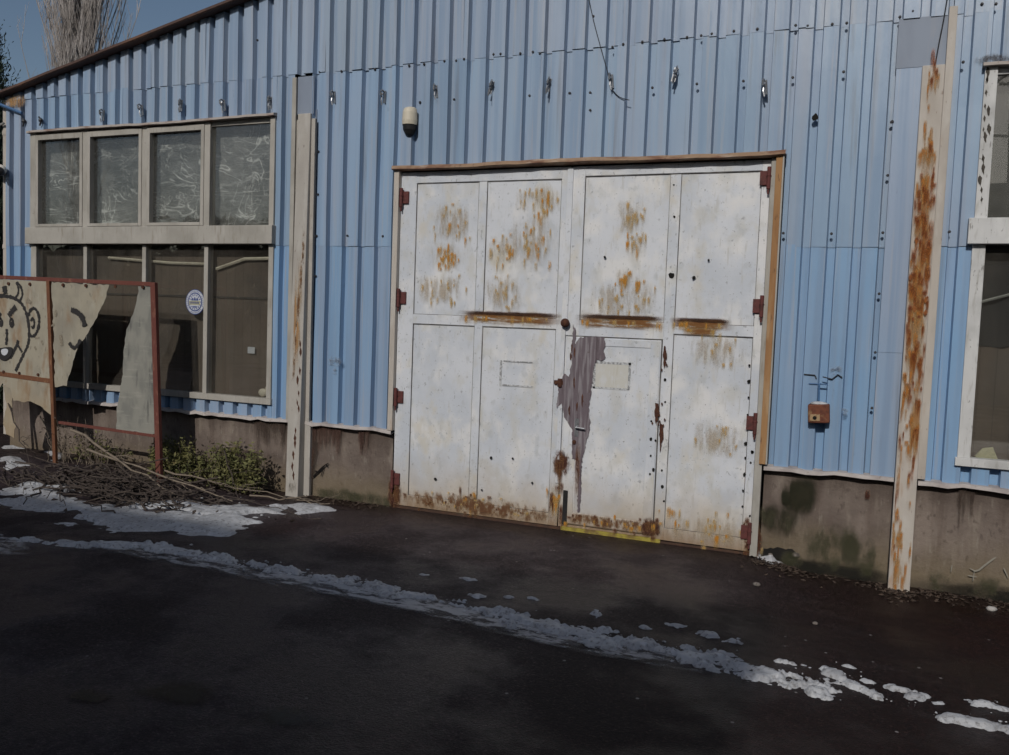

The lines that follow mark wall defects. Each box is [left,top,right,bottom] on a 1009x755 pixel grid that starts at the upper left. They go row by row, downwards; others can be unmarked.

corrosion [927,50,940,109]
corrosion [422,203,470,305]
corrosion [465,188,559,324]
corrosion [626,202,646,255]
corrosion [581,271,661,329]
corrosion [673,318,736,355]
corrosion [892,123,936,590]
corrosion [388,452,689,540]
water stain [763,479,815,533]
water stain [783,537,879,582]